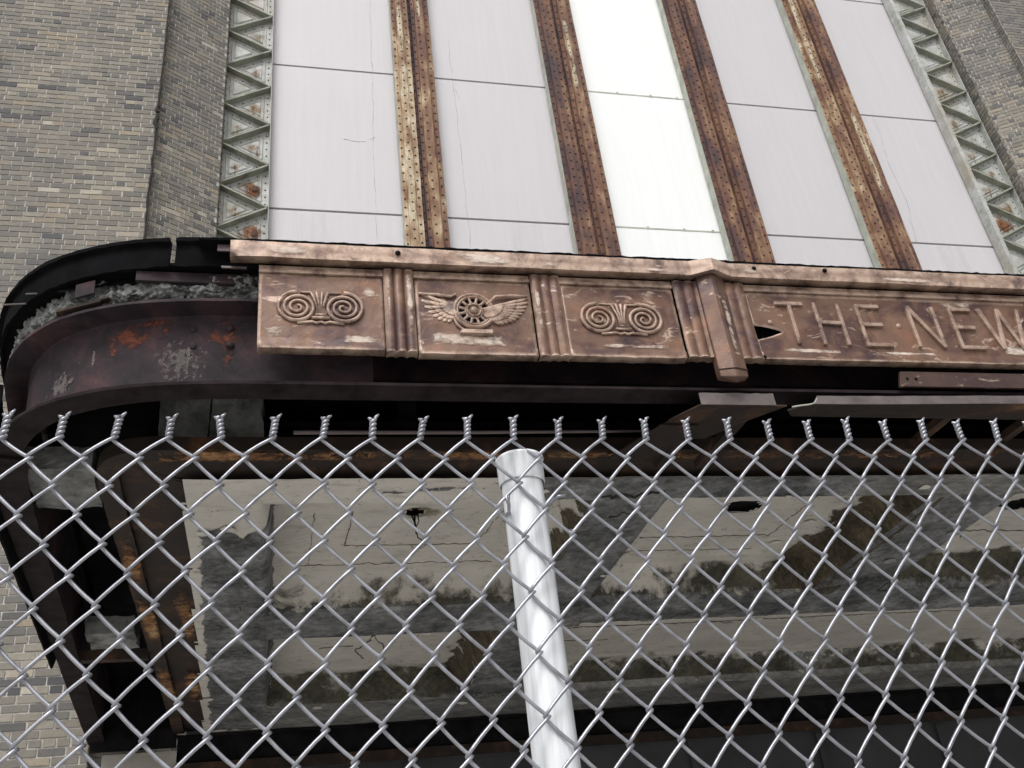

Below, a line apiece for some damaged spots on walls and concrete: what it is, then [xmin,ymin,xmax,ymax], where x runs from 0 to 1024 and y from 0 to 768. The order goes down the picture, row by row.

corrosion [245,184,261,197]
corrosion [996,206,1013,232]
spalling [9,274,259,358]
crack [299,511,504,566]
corrosion [121,546,142,583]
leakage [591,584,634,603]
leakage [654,559,841,594]
leakage [876,546,1024,592]
corrosion [136,601,158,639]
corrosion [176,597,195,636]
leakage [571,650,794,690]
leakage [817,638,1024,676]